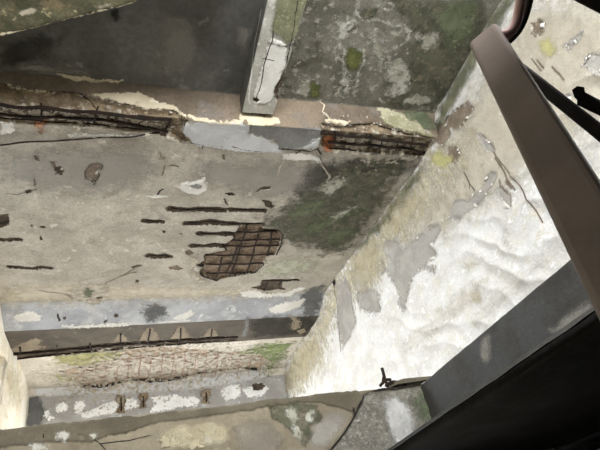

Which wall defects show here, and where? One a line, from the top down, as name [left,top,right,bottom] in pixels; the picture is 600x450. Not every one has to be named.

leakage [368,28,431,106]
peeling [530,18,546,37]
leakage [511,0,600,119]
spalling [0,82,190,146]
peeling [249,100,475,171]
leakage [548,101,575,134]
leakage [203,159,407,196]
spalling [185,221,284,281]
leakage [251,81,525,397]
leakage [102,285,245,323]
spalling [251,278,299,291]
spalling [11,325,293,420]